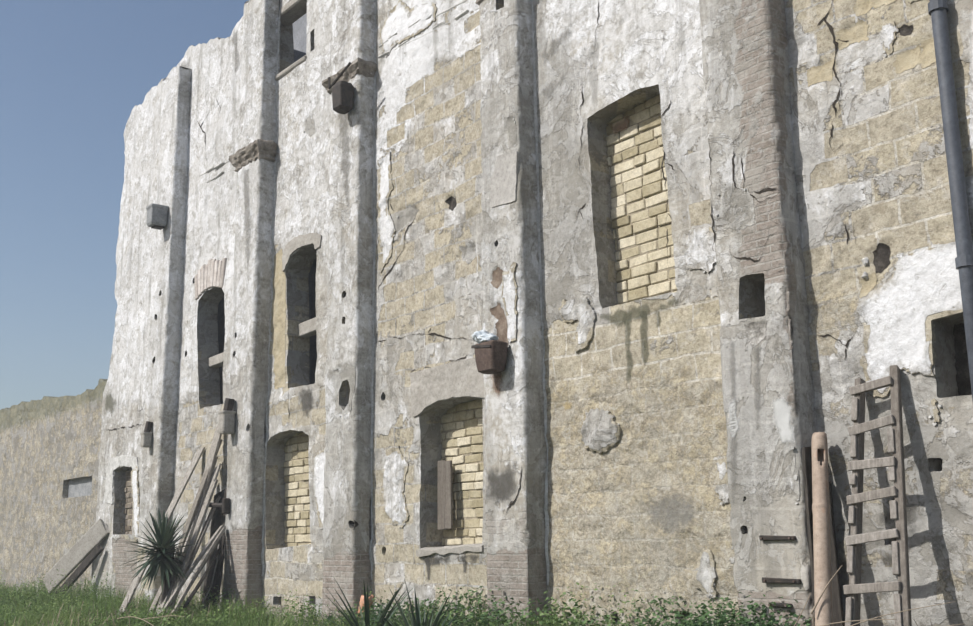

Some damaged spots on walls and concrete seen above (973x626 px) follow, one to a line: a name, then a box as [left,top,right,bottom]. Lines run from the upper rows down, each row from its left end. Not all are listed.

crack [818,0,848,151]
spalling [807,20,936,87]
flaking render [376,151,419,272]
crack [377,204,419,292]
spalling [445,196,457,211]
crack [709,129,782,276]
flaking render [490,262,518,343]
water stain [623,312,660,380]
crack [818,334,855,358]
flaking render [856,237,963,397]
flaking render [381,446,410,528]
water stain [488,471,514,500]